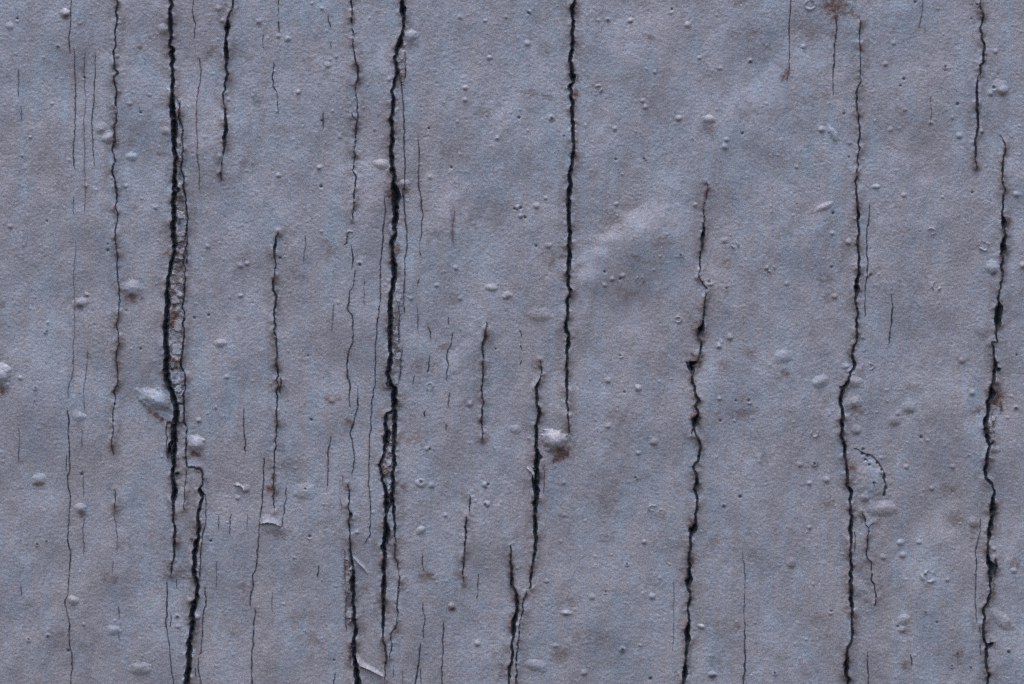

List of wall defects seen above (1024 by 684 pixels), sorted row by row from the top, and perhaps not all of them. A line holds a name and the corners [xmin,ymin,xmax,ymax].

crack [162,0,287,684]
crack [327,0,453,684]
crack [507,0,576,684]
crack [672,181,708,684]
crack [832,17,887,684]
crack [974,0,1007,684]